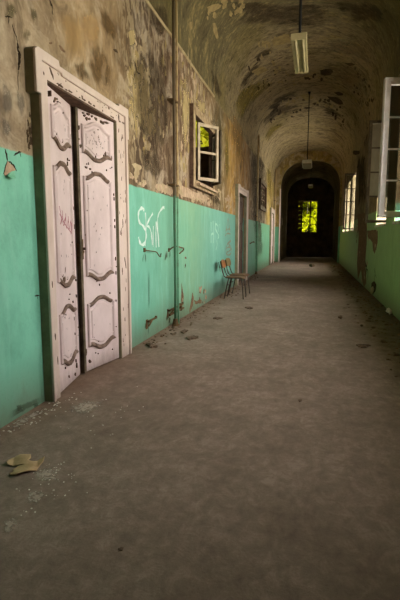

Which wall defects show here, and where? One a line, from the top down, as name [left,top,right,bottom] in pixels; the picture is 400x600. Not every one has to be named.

peeling [207,0,245,39]
leakage [242,49,271,85]
peeling [79,30,167,184]
leakage [264,92,298,140]
peeling [3,149,17,178]
peeling [53,133,72,183]
peeling [355,213,378,294]